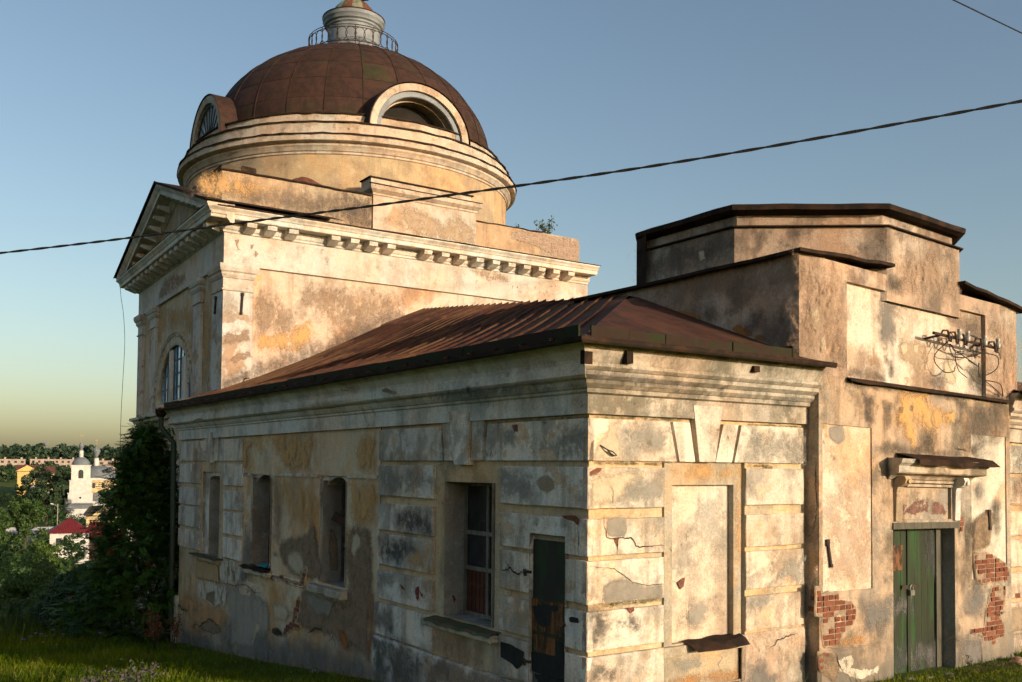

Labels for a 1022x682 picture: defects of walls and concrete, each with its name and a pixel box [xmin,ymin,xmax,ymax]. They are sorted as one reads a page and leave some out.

peeling [196,559,245,607]
spalling [271,524,372,654]
leakage [371,605,419,680]
crack [578,476,675,586]
peeling [903,499,947,515]
flaking render [959,512,1022,653]